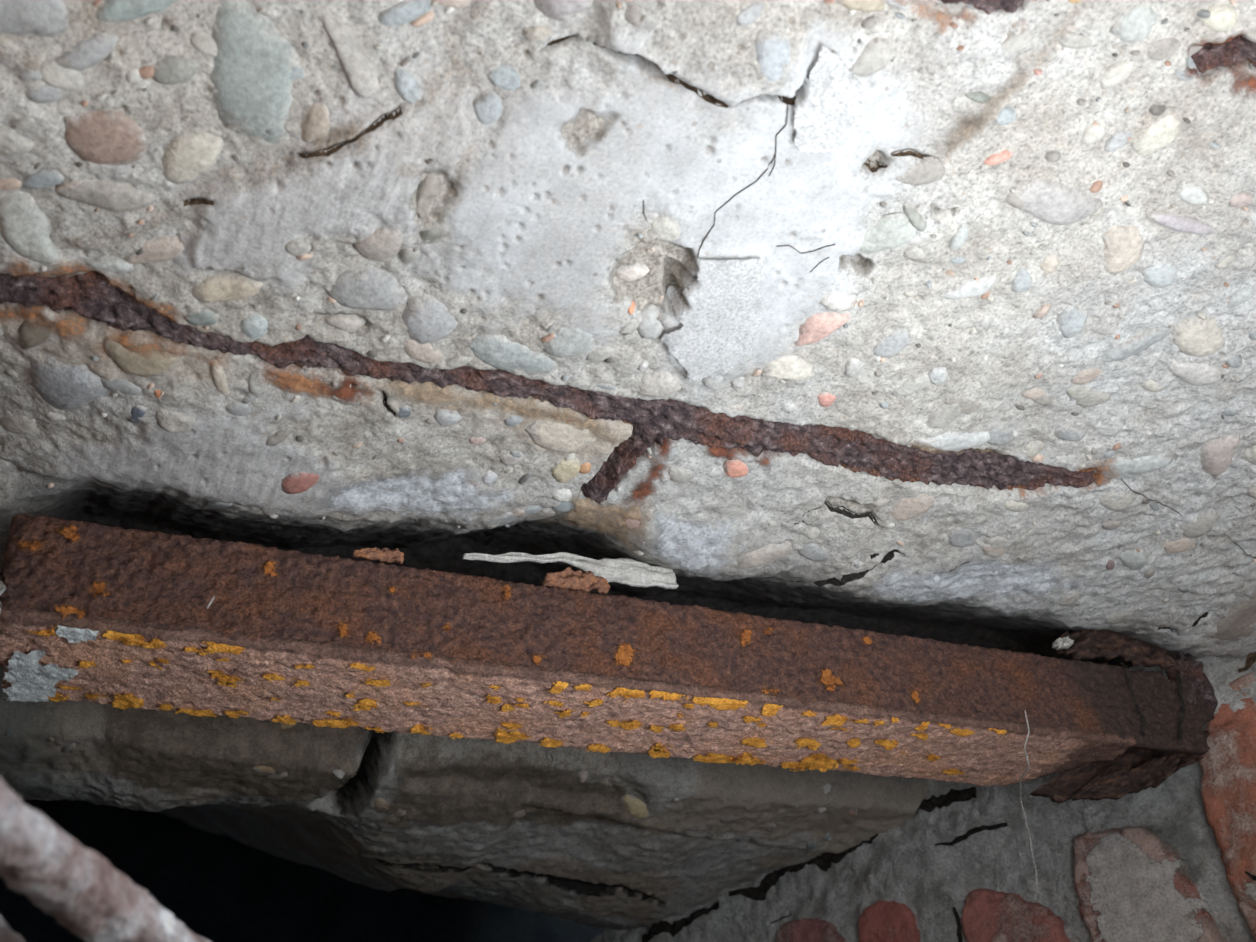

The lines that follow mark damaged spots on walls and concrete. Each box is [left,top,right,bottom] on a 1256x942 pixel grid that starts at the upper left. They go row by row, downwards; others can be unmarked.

crack [298,106,402,158]
crack [546,35,795,258]
peeling [610,239,764,382]
spalling [825,497,874,516]
corrosion [352,547,404,565]
peeling [462,552,679,590]
corrosion [542,567,611,595]
corrosion [1052,629,1218,740]
corrosion [1029,748,1203,804]
crack [915,787,1008,846]
crack [375,833,879,942]
spalling [1245,883,1256,902]